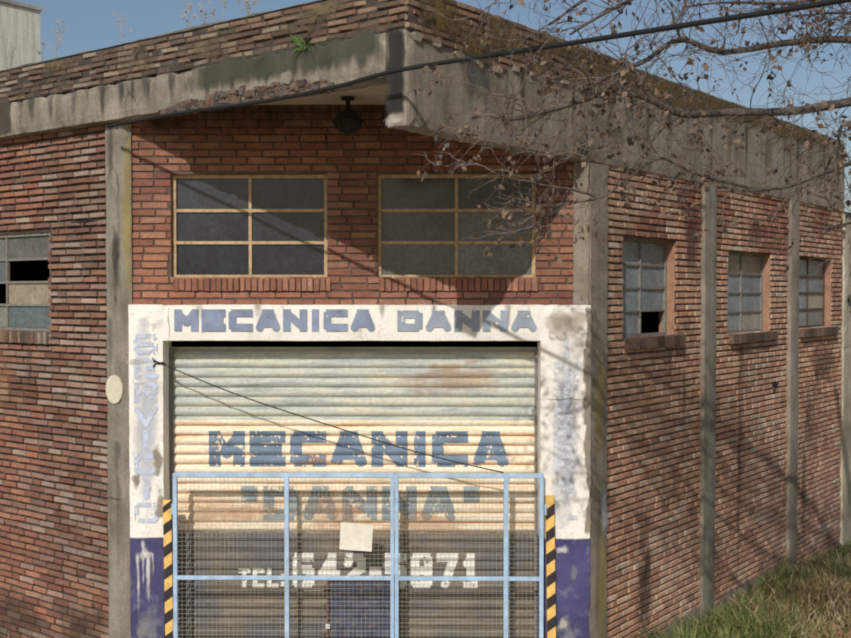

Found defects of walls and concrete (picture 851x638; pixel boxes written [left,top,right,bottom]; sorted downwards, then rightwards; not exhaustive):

water stain [386,29,405,114]
water stain [0,100,10,134]
water stain [552,315,583,331]
peeling [153,449,162,474]
peeling [556,619,574,638]